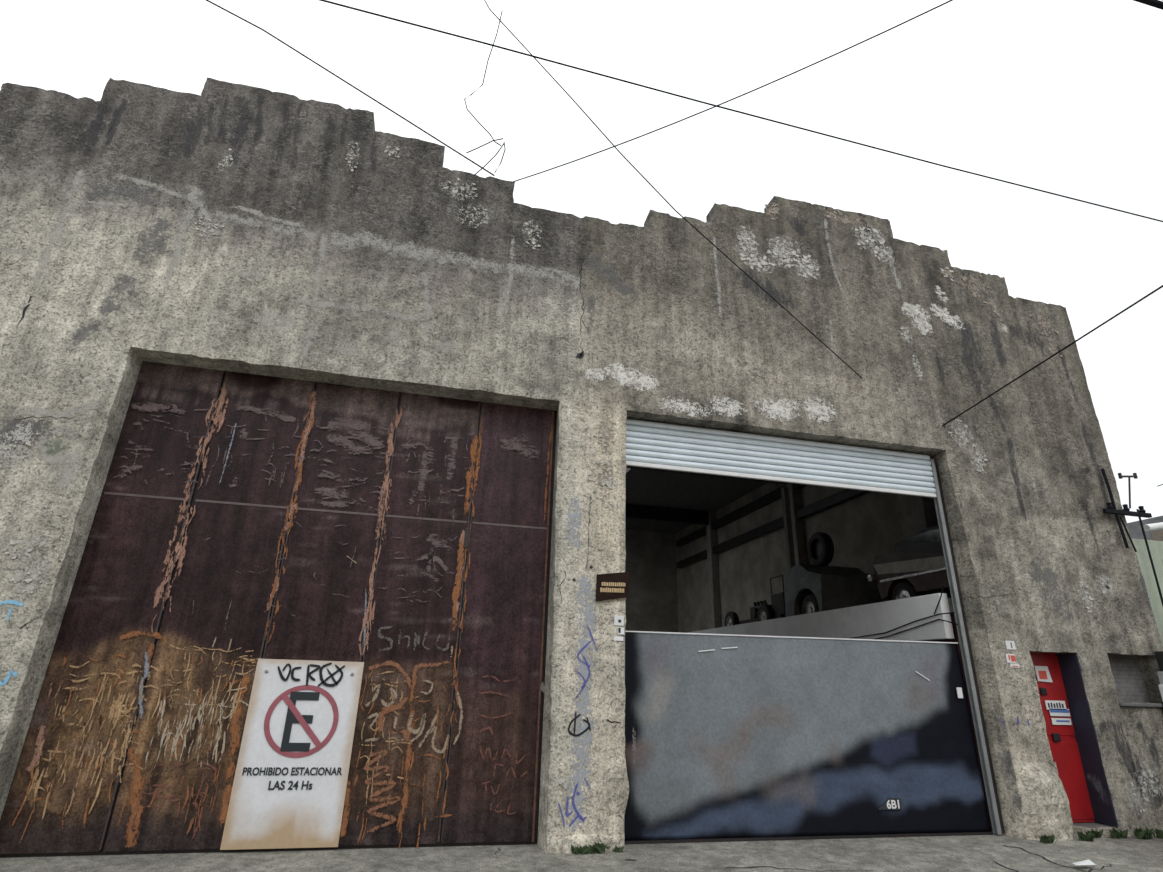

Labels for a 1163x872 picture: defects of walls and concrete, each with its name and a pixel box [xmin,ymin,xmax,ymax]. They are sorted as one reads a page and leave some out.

crack [16,296,32,327]
damp [35,94,639,373]
damp [713,237,722,316]
corrosion [206,388,229,443]
corrosion [284,391,318,530]
corrosion [464,435,479,514]
corrosion [153,468,194,607]
corrosion [452,530,465,631]
corrosion [64,661,250,848]